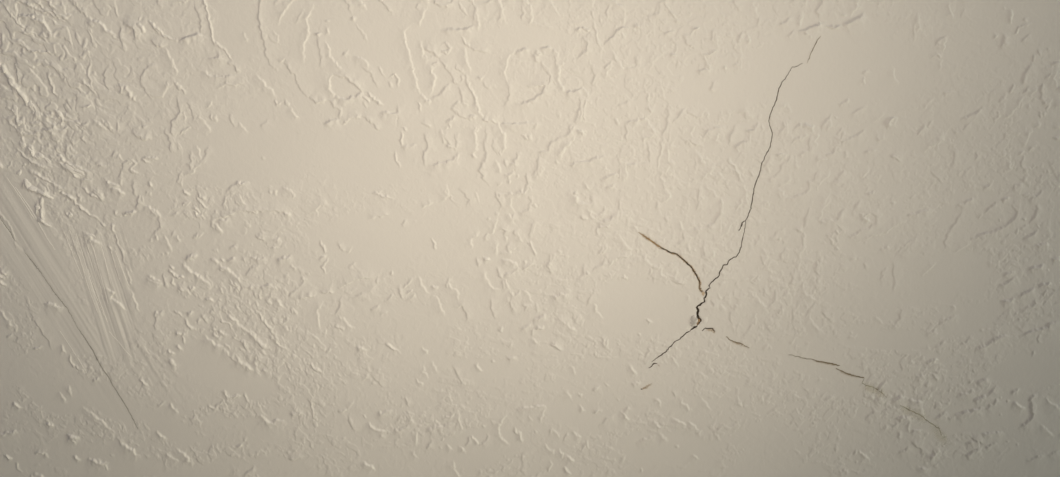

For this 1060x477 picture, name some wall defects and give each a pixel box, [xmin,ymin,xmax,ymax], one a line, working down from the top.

crack [638,36,821,368]
crack [793,355,941,433]